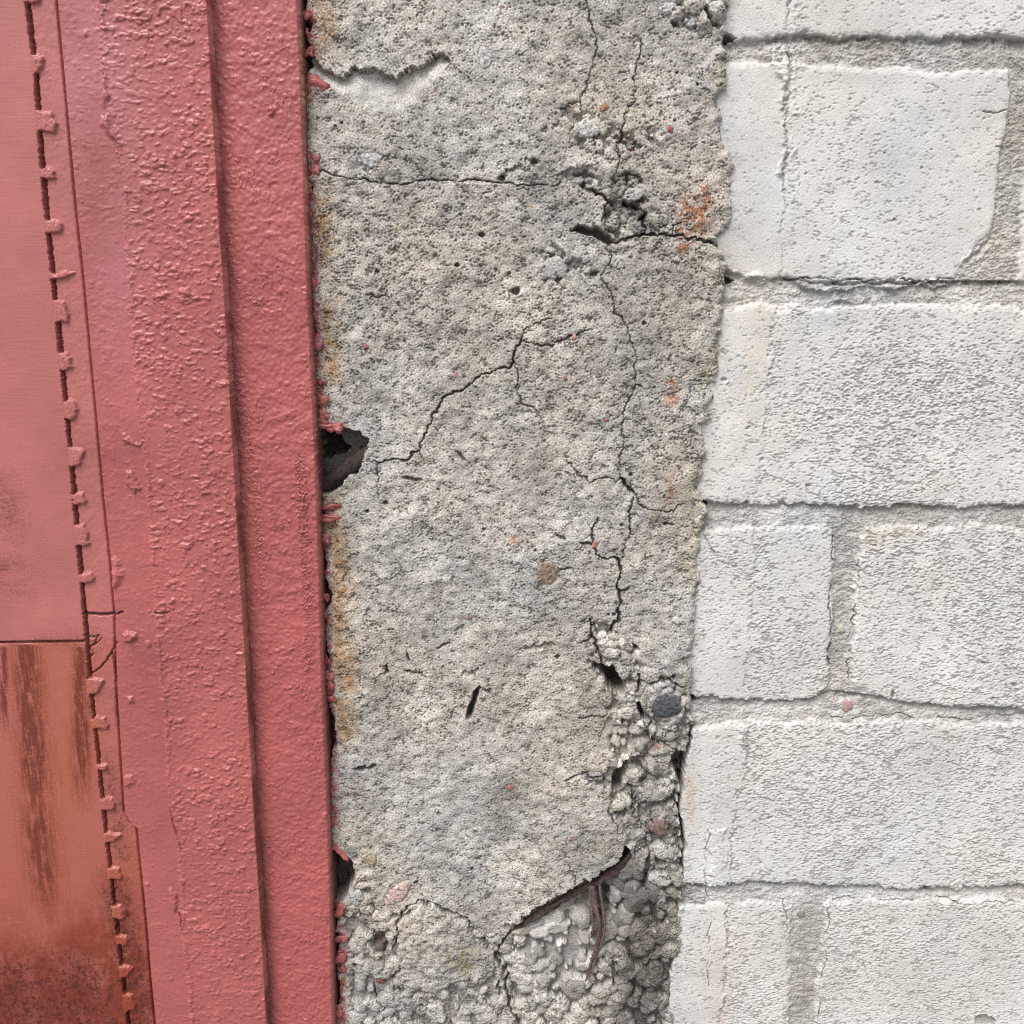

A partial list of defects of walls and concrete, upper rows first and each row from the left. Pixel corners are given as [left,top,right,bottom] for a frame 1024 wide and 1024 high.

crack [558,0,599,114]
corrosion [665,172,726,260]
crack [320,38,717,665]
spalling [323,445,368,492]
crack [702,532,730,575]
crack [404,669,428,679]
spalling [525,641,554,653]
crack [647,676,688,689]
spalling [597,716,655,798]
corrosion [0,623,156,1024]
spalling [504,846,649,981]